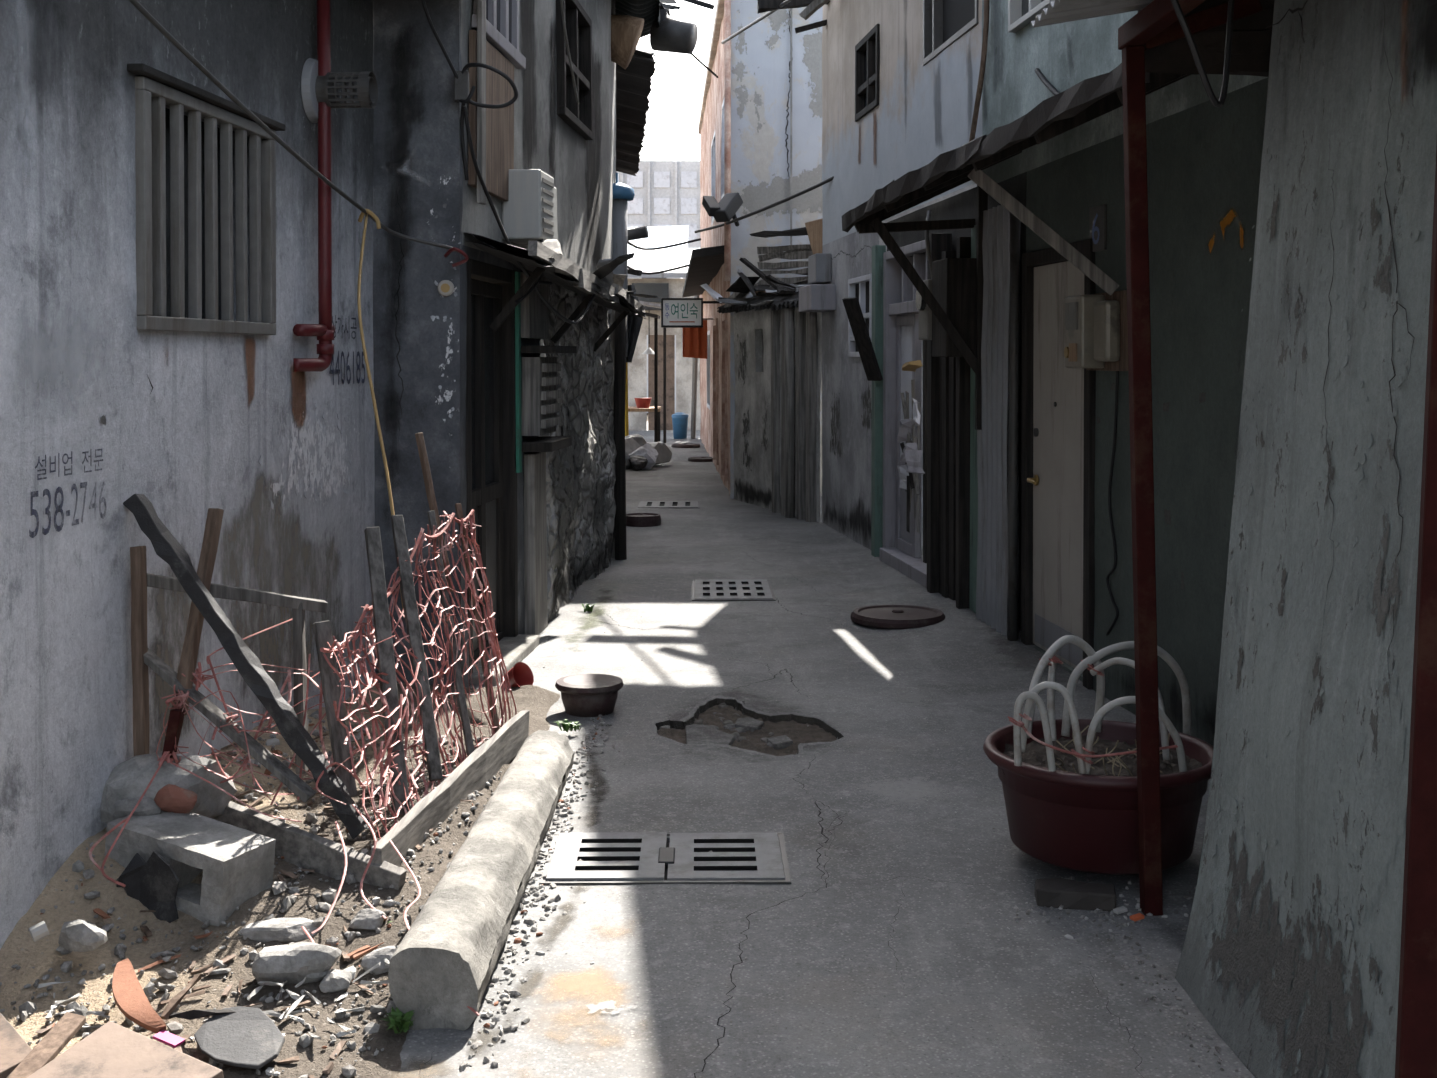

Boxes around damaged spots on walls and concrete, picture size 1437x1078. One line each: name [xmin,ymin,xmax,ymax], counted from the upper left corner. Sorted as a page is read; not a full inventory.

peeling [732,10,765,133]
peeling [765,9,822,117]
peeling [738,164,822,219]
peeling [1339,181,1402,309]
peeling [431,315,459,436]
crack [694,754,1005,1078]
peeling [1203,799,1383,1078]